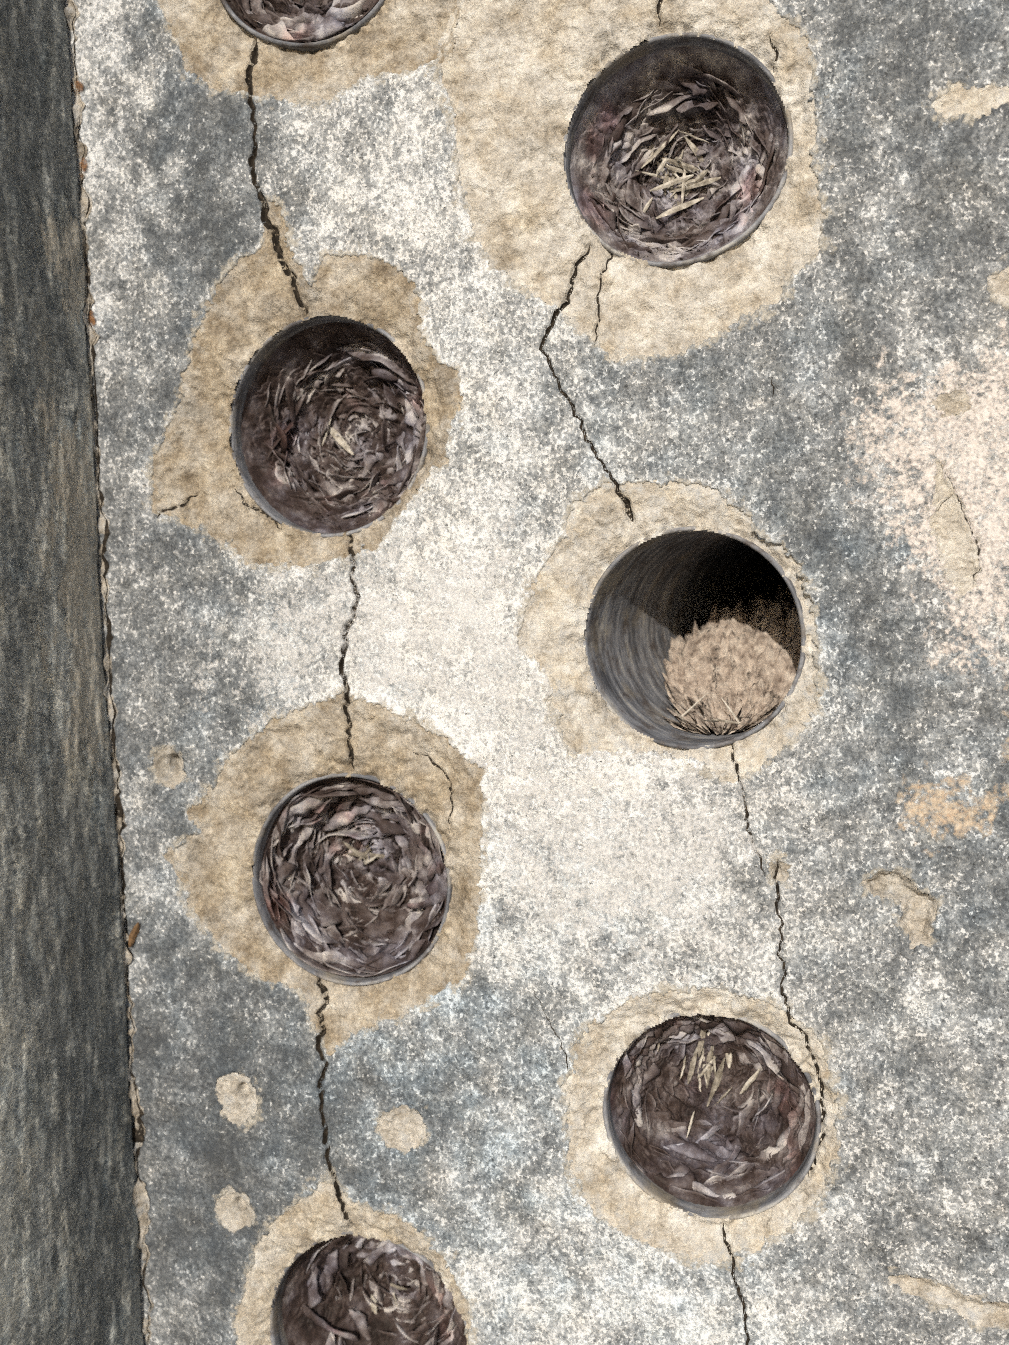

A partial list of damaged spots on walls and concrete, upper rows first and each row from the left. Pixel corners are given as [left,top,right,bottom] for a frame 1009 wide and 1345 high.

crack [656,0,664,25]
crack [769,35,779,70]
crack [245,41,309,315]
crack [539,245,633,522]
crack [157,493,200,518]
crack [235,489,281,529]
crack [72,2,151,1345]
crack [339,535,360,769]
crack [731,745,826,1176]
spalling [861,866,942,949]
crack [315,978,352,1223]
crack [722,1223,750,1345]